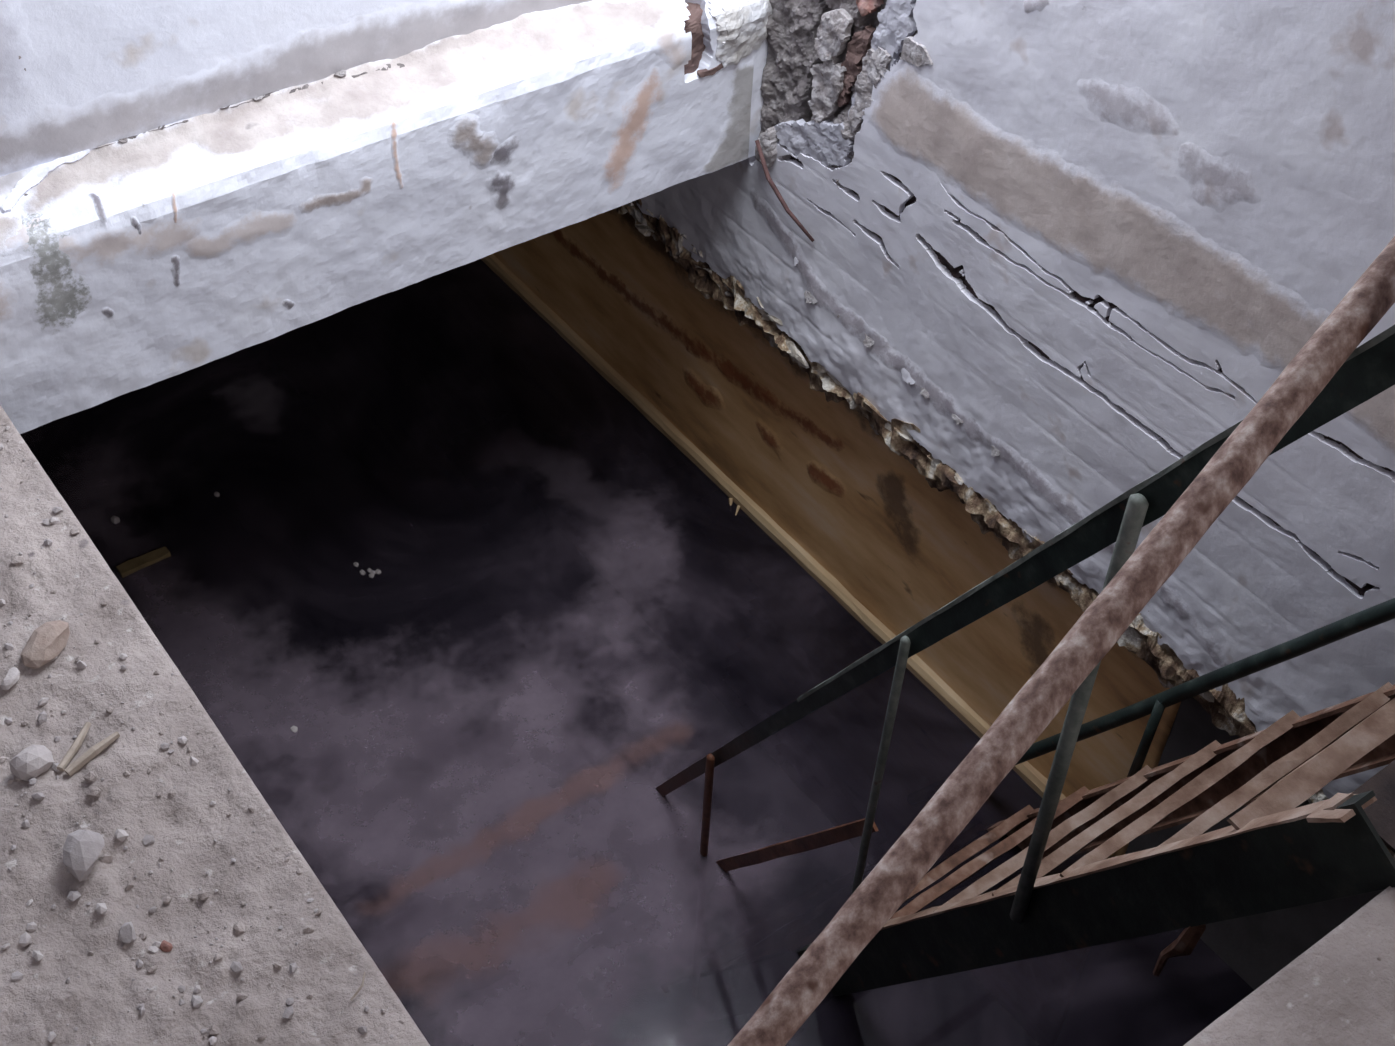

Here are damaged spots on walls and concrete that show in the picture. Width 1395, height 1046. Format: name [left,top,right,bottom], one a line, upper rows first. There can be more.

leakage [1023,0,1050,14]
leakage [0,0,593,177]
corrosion [598,23,692,195]
flaking render [0,0,1331,373]
leakage [1077,77,1262,214]
leakage [0,205,299,336]
flaking render [614,187,1086,560]
crack [830,174,1173,449]
crack [1316,432,1394,472]
flaking render [1343,385,1395,460]
crack [1237,496,1377,596]
flaking render [1115,582,1259,738]